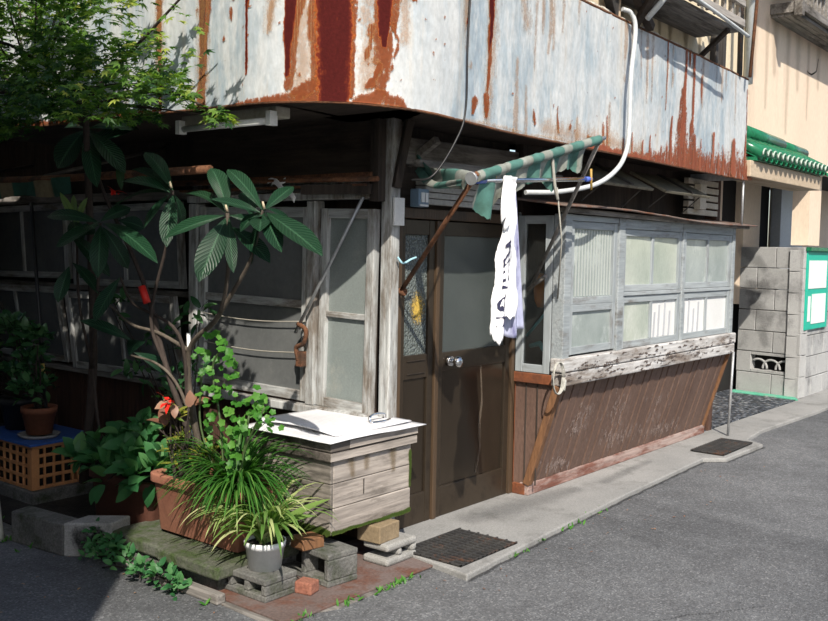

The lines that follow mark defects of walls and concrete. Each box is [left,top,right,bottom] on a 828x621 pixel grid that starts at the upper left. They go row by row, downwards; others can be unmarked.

rust [196,0,211,109]
rust [231,0,407,108]
rust [472,0,495,118]
rust [587,50,752,181]
peeling [565,336,734,381]